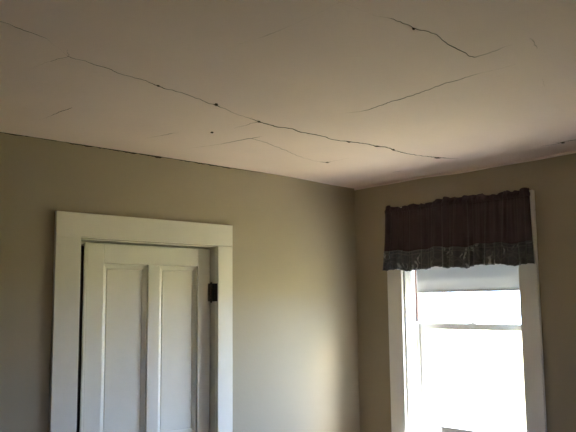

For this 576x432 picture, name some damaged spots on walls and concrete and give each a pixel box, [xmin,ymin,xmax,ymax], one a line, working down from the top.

crack [374,15,506,58]
crack [41,52,459,163]
crack [0,132,276,175]